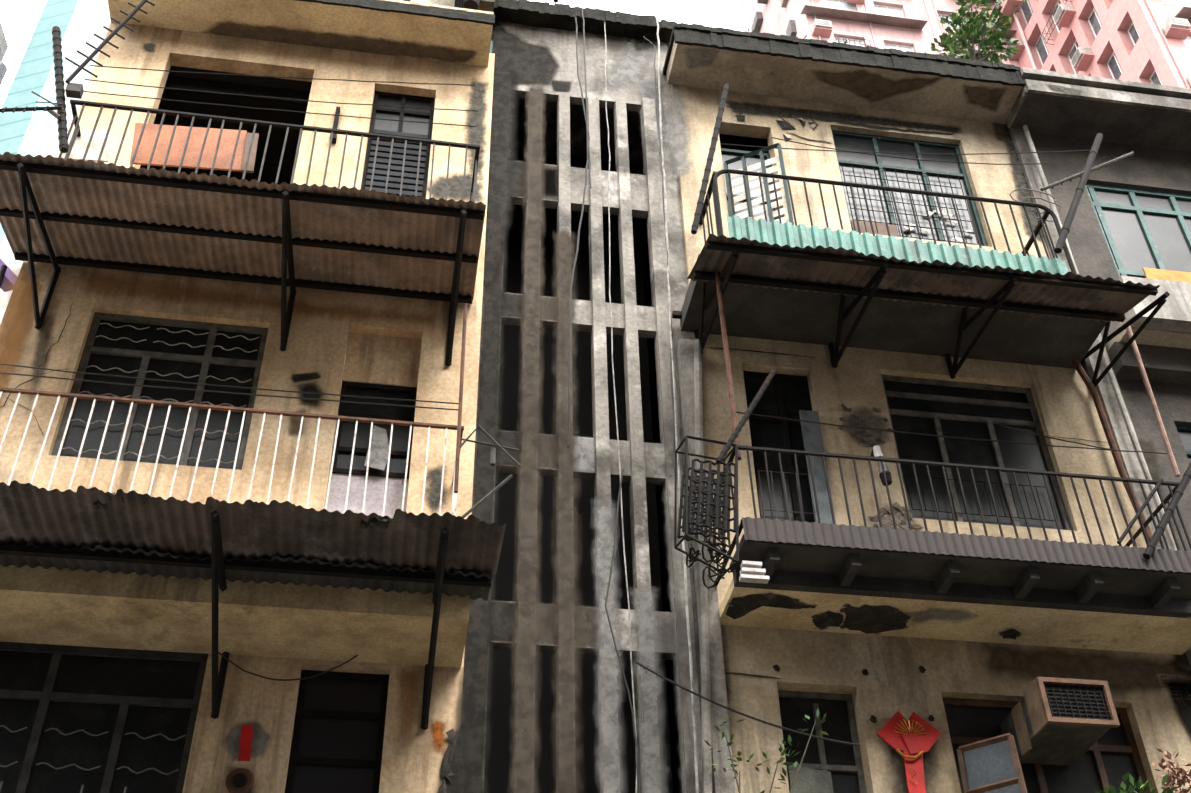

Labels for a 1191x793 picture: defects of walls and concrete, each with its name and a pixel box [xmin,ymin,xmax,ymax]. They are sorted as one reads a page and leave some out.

leakage [203,22,476,63]
leakage [609,38,688,175]
leakage [728,102,961,133]
leakage [815,70,944,101]
leakage [964,86,1006,111]
leakage [292,372,321,382]
leakage [289,410,305,435]
leakage [426,21,622,793]
spalling [726,593,971,635]
spalling [999,629,1022,640]
leakage [635,591,664,793]